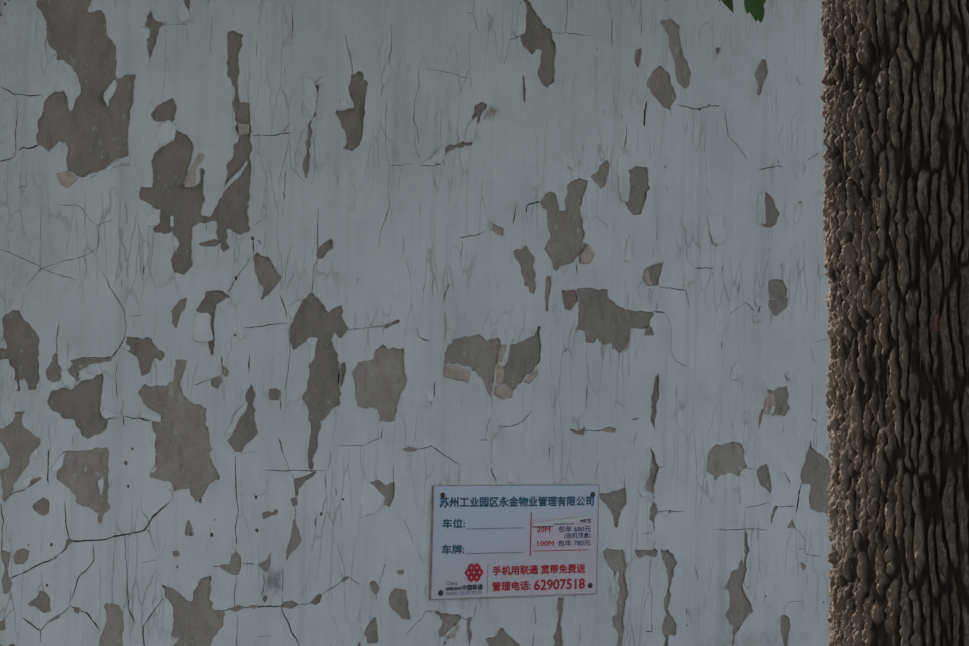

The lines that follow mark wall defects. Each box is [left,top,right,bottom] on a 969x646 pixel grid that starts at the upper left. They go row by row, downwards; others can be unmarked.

peeling [36,0,136,188]
peeling [139,30,253,275]
peeling [335,71,368,151]
peeling [515,0,556,88]
peeling [513,146,655,353]
peeling [0,310,122,524]
peeling [121,337,220,503]
peeling [286,293,407,561]
peeling [444,307,542,400]
crack [73,506,164,542]
peeling [162,576,268,646]
peeling [603,548,687,646]